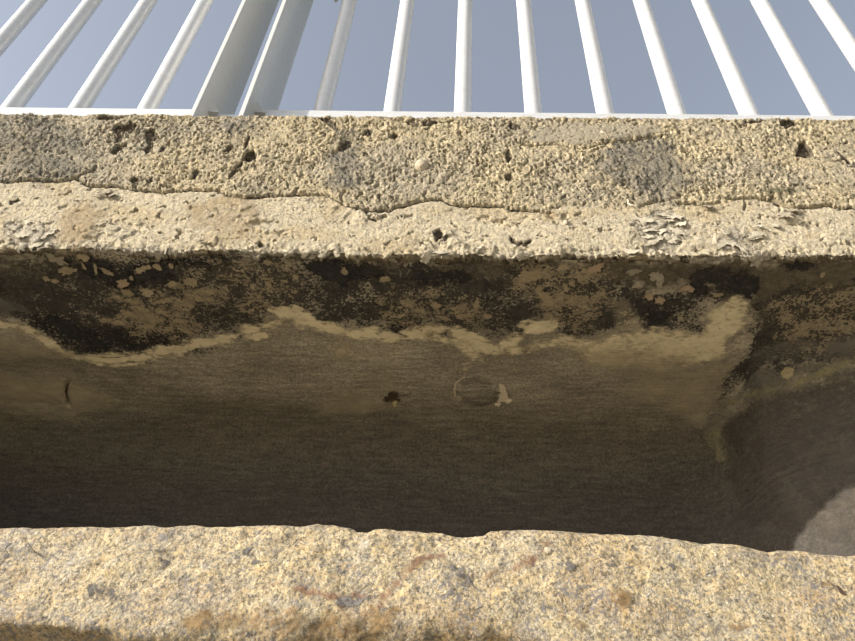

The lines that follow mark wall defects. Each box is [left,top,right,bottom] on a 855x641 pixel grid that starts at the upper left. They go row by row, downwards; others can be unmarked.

crack [3,170,552,222]
spalling [420,230,448,264]
peeling [469,209,800,334]
water stain [0,252,855,534]